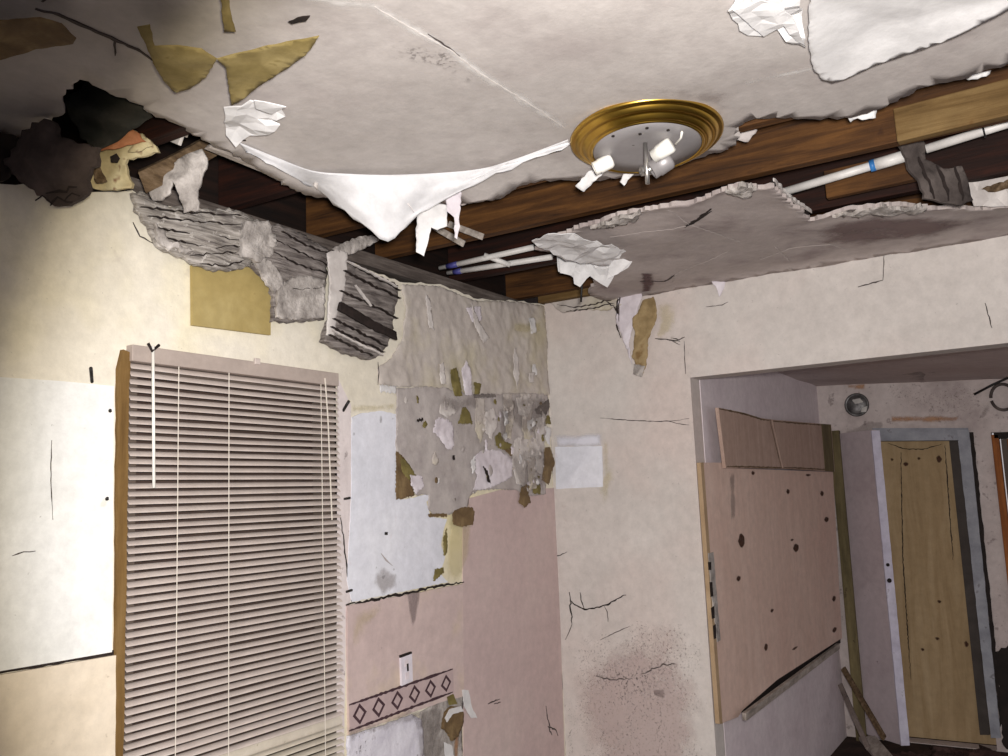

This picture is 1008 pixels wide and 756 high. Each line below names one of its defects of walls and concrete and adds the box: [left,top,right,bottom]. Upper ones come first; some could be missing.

peeling [808,0,1008,83]
flaking render [725,181,757,199]
flaking render [832,203,927,219]
flaking render [130,190,329,324]
peeling [432,403,456,465]
peeling [471,394,603,493]
crack [565,592,630,640]
flaking render [346,690,477,756]